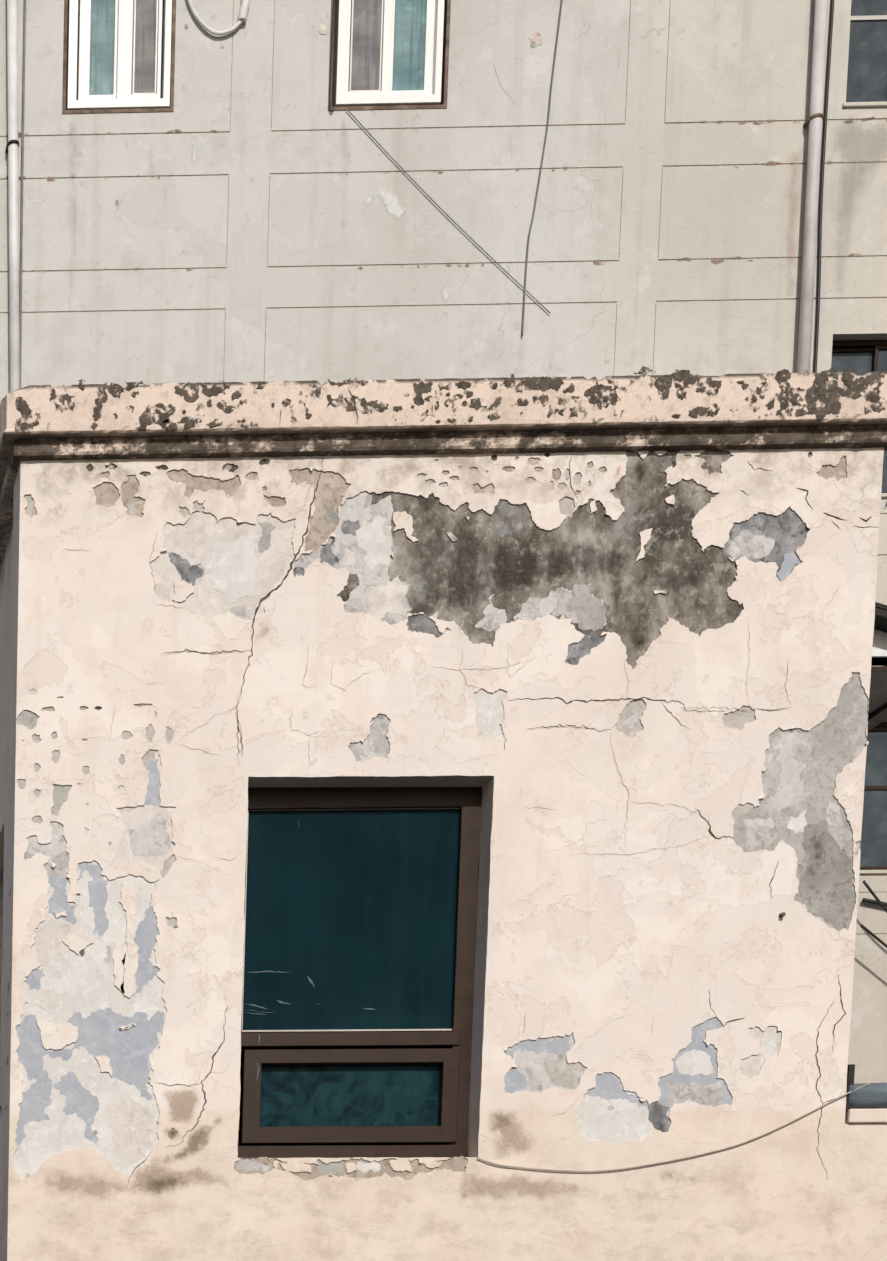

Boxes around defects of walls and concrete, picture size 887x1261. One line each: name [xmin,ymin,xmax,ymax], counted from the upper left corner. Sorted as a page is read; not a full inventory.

crack [149,533,197,613]
crack [160,459,323,757]
flaking render [86,451,811,669]
water stain [424,526,623,603]
peeling [722,706,756,730]
flaking render [732,673,869,931]
peeling [4,697,178,1180]
water stain [137,1168,210,1192]
water stain [170,1092,196,1136]
flaking render [234,1156,468,1181]
peeling [503,1017,732,1144]
crack [815,975,846,1179]